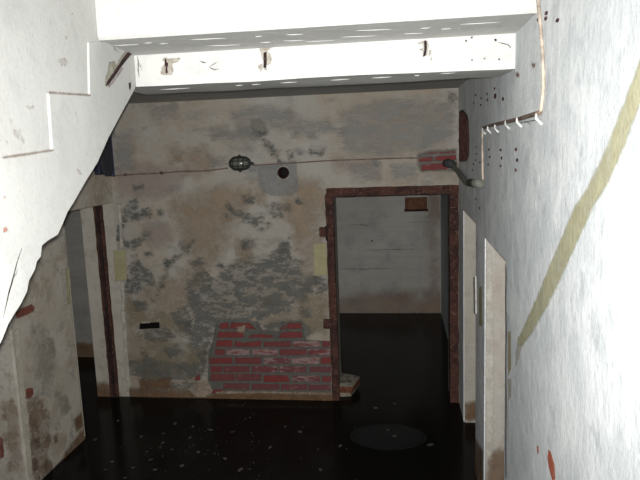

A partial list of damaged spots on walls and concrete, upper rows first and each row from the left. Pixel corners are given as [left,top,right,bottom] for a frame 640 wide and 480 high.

spalling [161,57,180,75]
spalling [259,48,271,70]
flaking render [418,110,469,171]
peeling [16,305,34,318]
water stain [127,267,334,401]
flaking render [172,242,331,400]
water stain [359,258,441,313]
water stain [61,413,86,461]